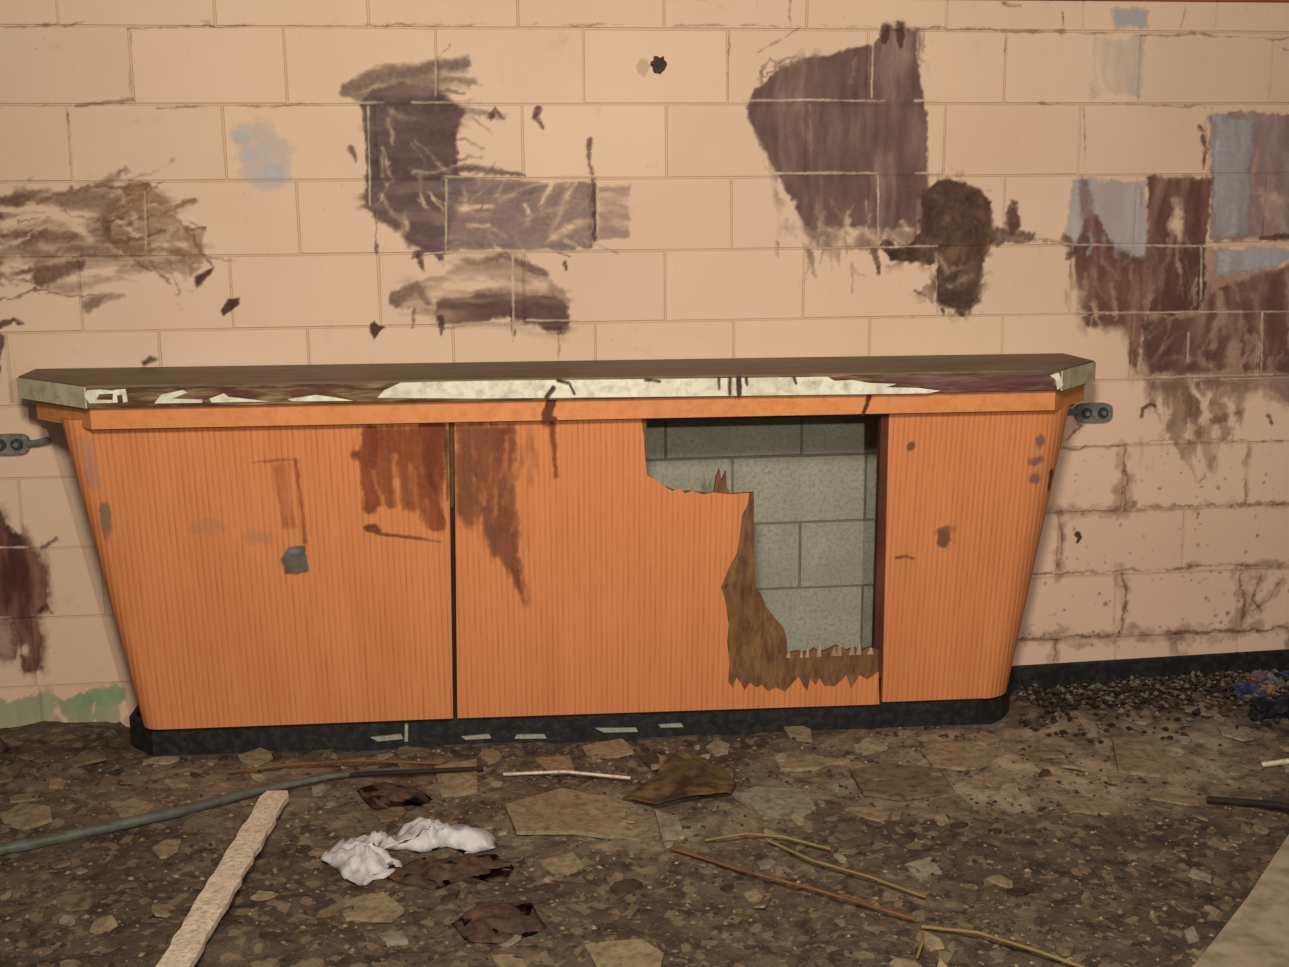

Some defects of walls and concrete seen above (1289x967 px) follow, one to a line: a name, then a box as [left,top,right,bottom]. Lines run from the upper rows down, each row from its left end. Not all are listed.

peeling [195,269,213,286]